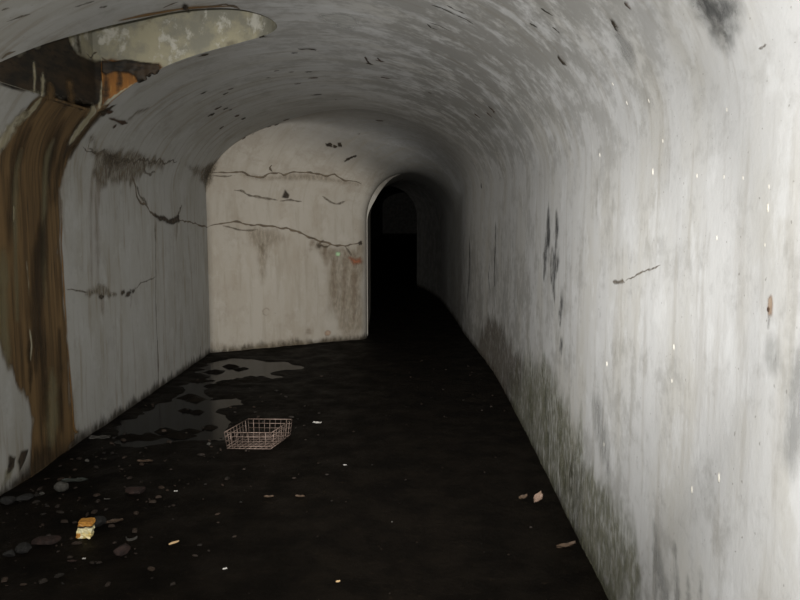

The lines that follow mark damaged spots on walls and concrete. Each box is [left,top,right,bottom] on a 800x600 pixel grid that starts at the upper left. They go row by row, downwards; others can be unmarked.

crack [132,176,155,216]
crack [213,165,361,202]
crack [180,220,362,256]
rust [0,59,162,485]
crack [613,265,659,284]